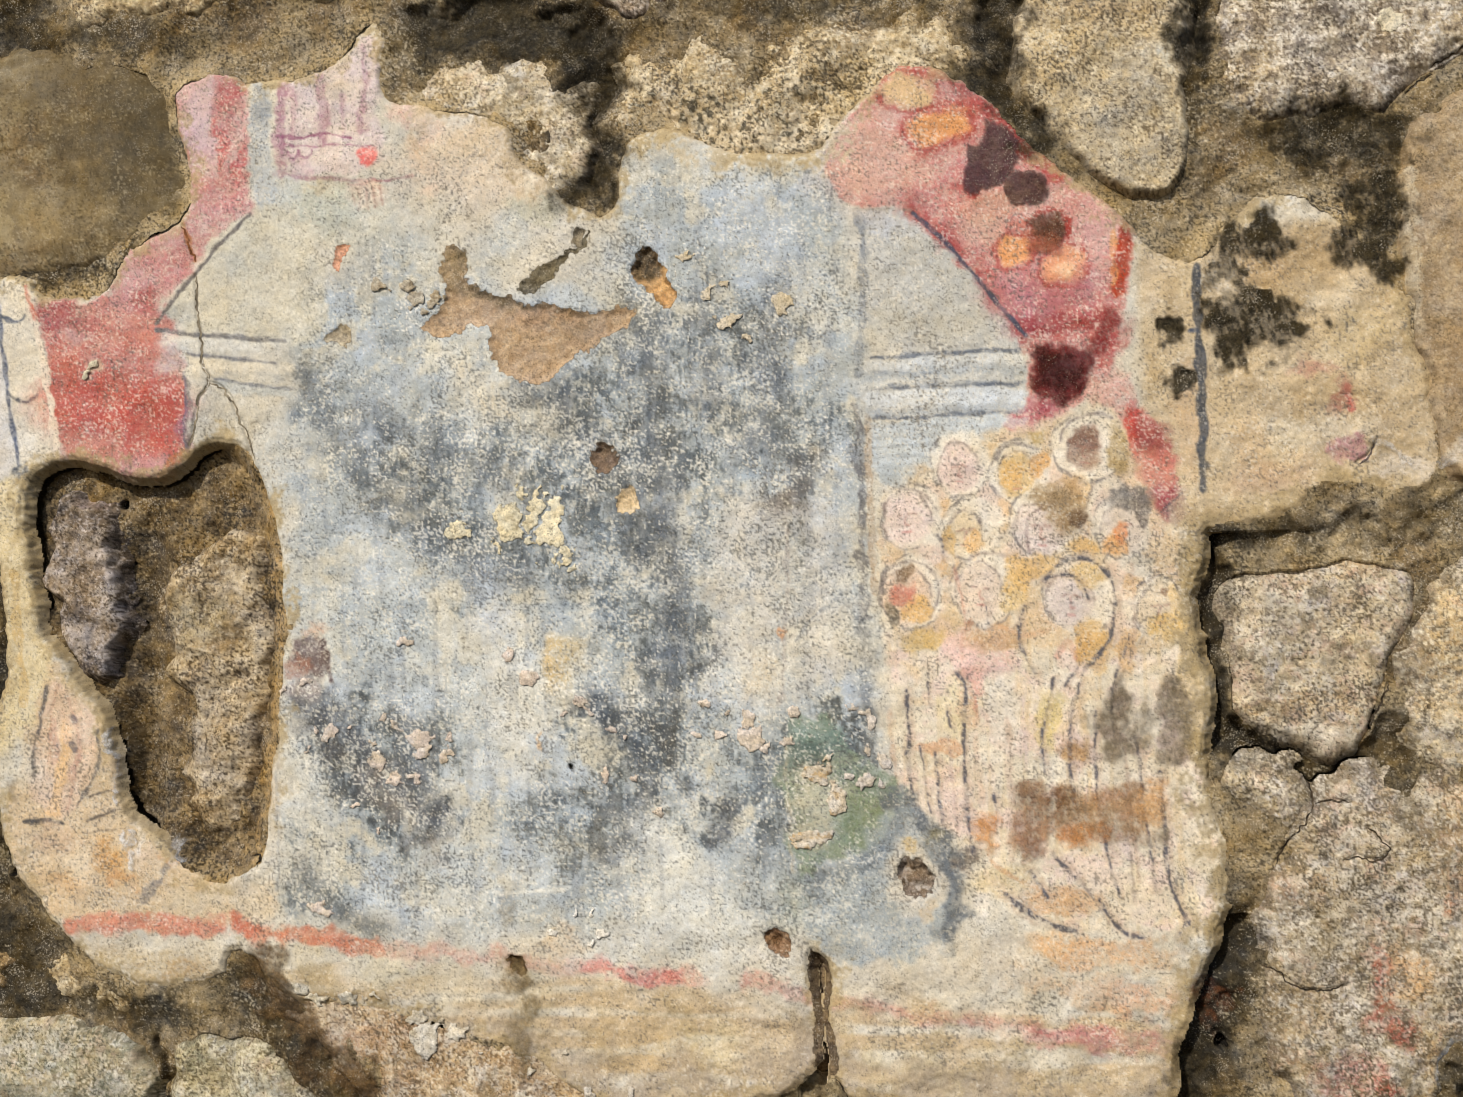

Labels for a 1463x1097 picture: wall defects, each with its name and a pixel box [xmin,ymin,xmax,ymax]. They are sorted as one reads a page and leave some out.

damp [429,0,627,209]
flaking render [371,227,637,385]
flaking render [631,246,695,309]
peeling [700,281,752,344]
peeling [771,292,794,316]
damp [1200,204,1331,372]
flaking render [42,445,313,884]
peeling [502,646,540,686]
peeling [304,723,351,753]
peeling [367,713,455,786]
peeling [307,900,335,918]
damp [239,944,378,1097]